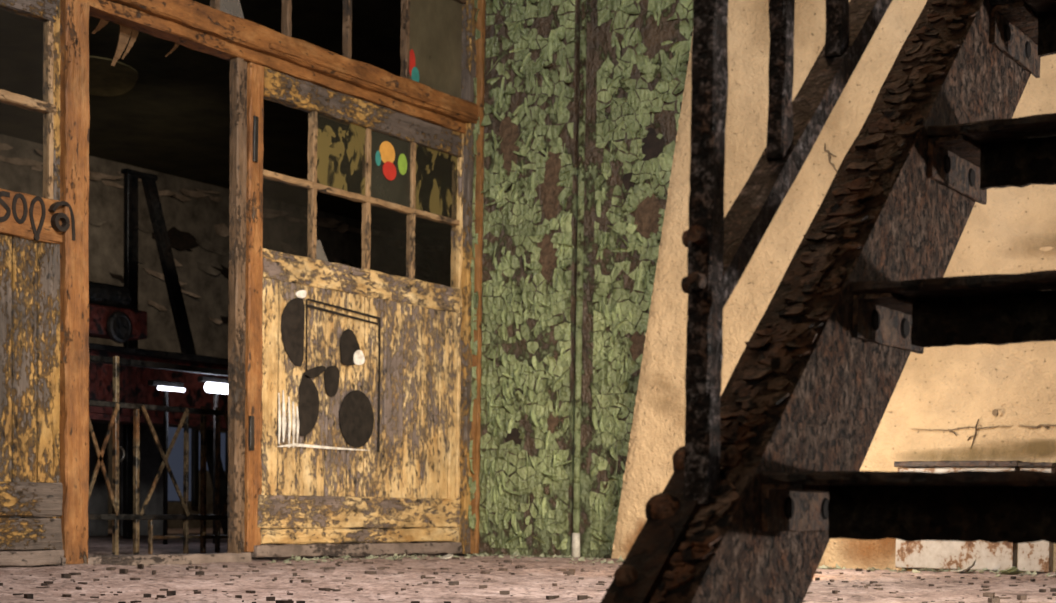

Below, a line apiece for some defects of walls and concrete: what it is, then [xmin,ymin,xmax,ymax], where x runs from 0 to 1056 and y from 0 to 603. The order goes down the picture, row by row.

water stain [992,442,1054,458]